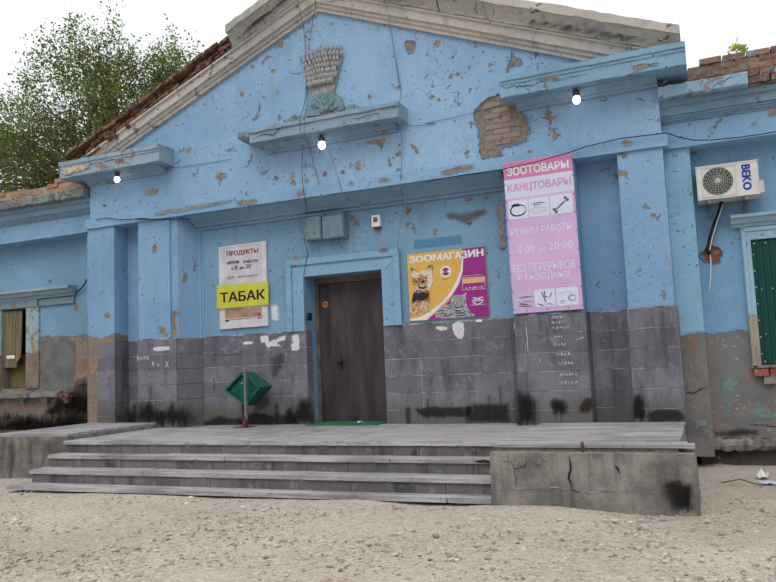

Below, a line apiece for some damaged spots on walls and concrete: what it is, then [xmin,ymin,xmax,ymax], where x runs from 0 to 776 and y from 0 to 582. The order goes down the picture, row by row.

flaking render [404,40,416,54]
flaking render [506,51,524,73]
spalling [441,93,531,175]
peeling [464,195,506,248]
spalling [698,245,724,264]
water stain [0,362,87,430]
water stain [417,404,509,421]
water stain [580,398,592,411]
water stain [640,409,684,422]
crack [474,457,653,502]